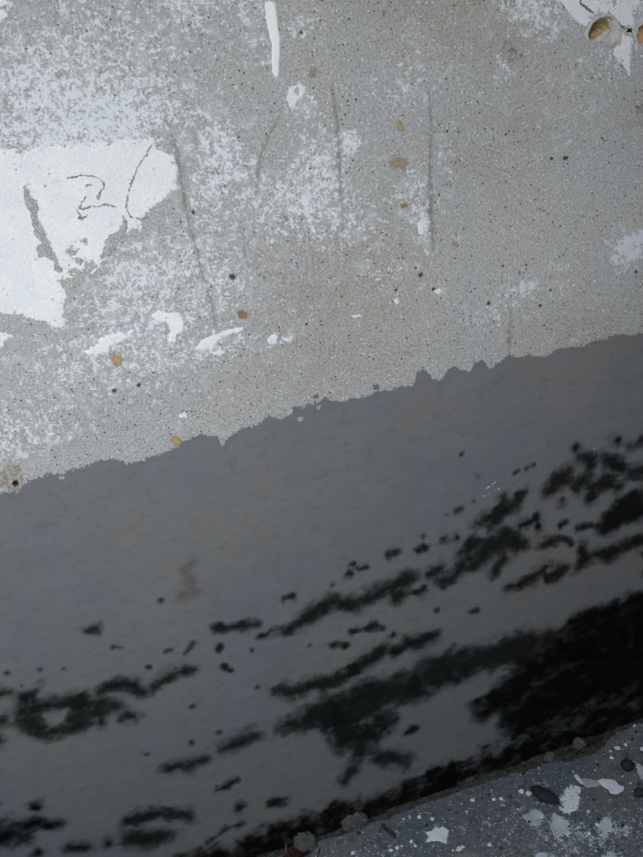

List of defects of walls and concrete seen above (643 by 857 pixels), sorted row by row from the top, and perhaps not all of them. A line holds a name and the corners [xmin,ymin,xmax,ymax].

flaking render [0,0,14,22]
crack [579,0,594,14]
flaking render [559,0,643,76]
flaking render [0,137,178,328]
flaking render [85,330,134,356]
flaking render [151,310,184,343]